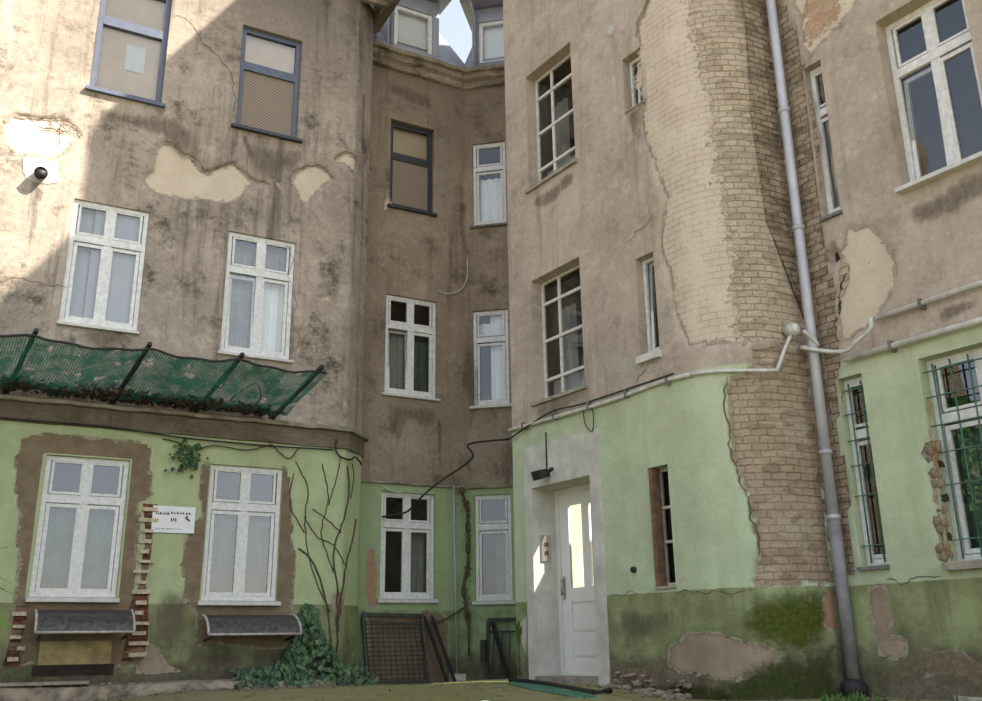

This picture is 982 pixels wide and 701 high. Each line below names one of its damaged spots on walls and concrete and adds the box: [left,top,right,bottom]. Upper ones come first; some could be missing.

flaking render [0,113,82,160]
flaking render [144,141,357,204]
flaking render [742,0,897,576]
spalling [641,83,839,633]
spalling [667,631,782,683]
flaking render [868,585,909,661]